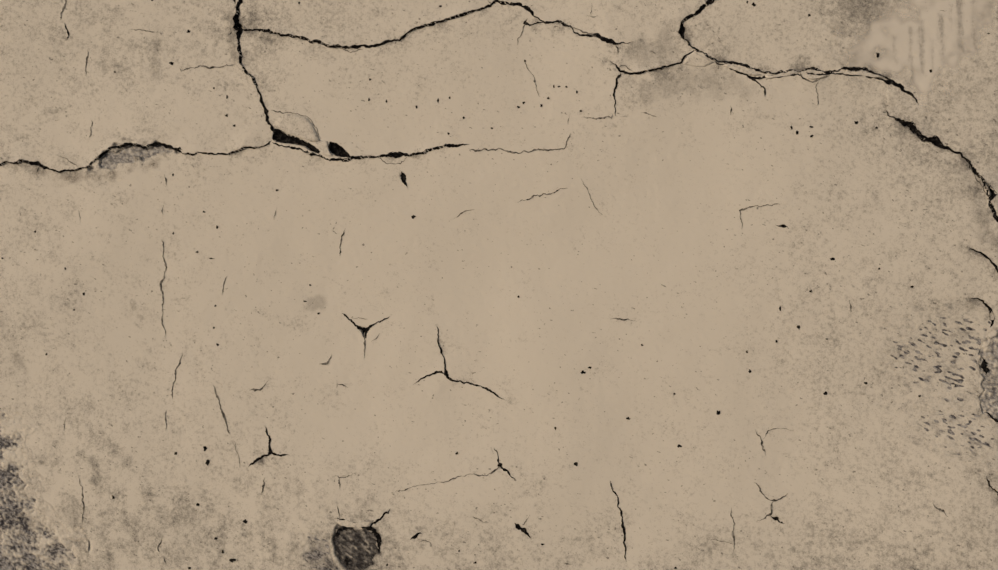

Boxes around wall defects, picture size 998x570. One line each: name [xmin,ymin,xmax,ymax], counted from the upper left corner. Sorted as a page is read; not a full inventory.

crack [0,0,998,222]
crack [159,241,167,335]
crack [165,358,181,428]
crack [342,313,389,358]
crack [417,327,502,399]
crack [971,298,995,327]
crack [971,249,998,273]
peeling [978,329,998,424]
peeling [0,405,88,570]
crack [214,387,288,494]
crack [398,449,515,492]
spalling [333,507,390,570]